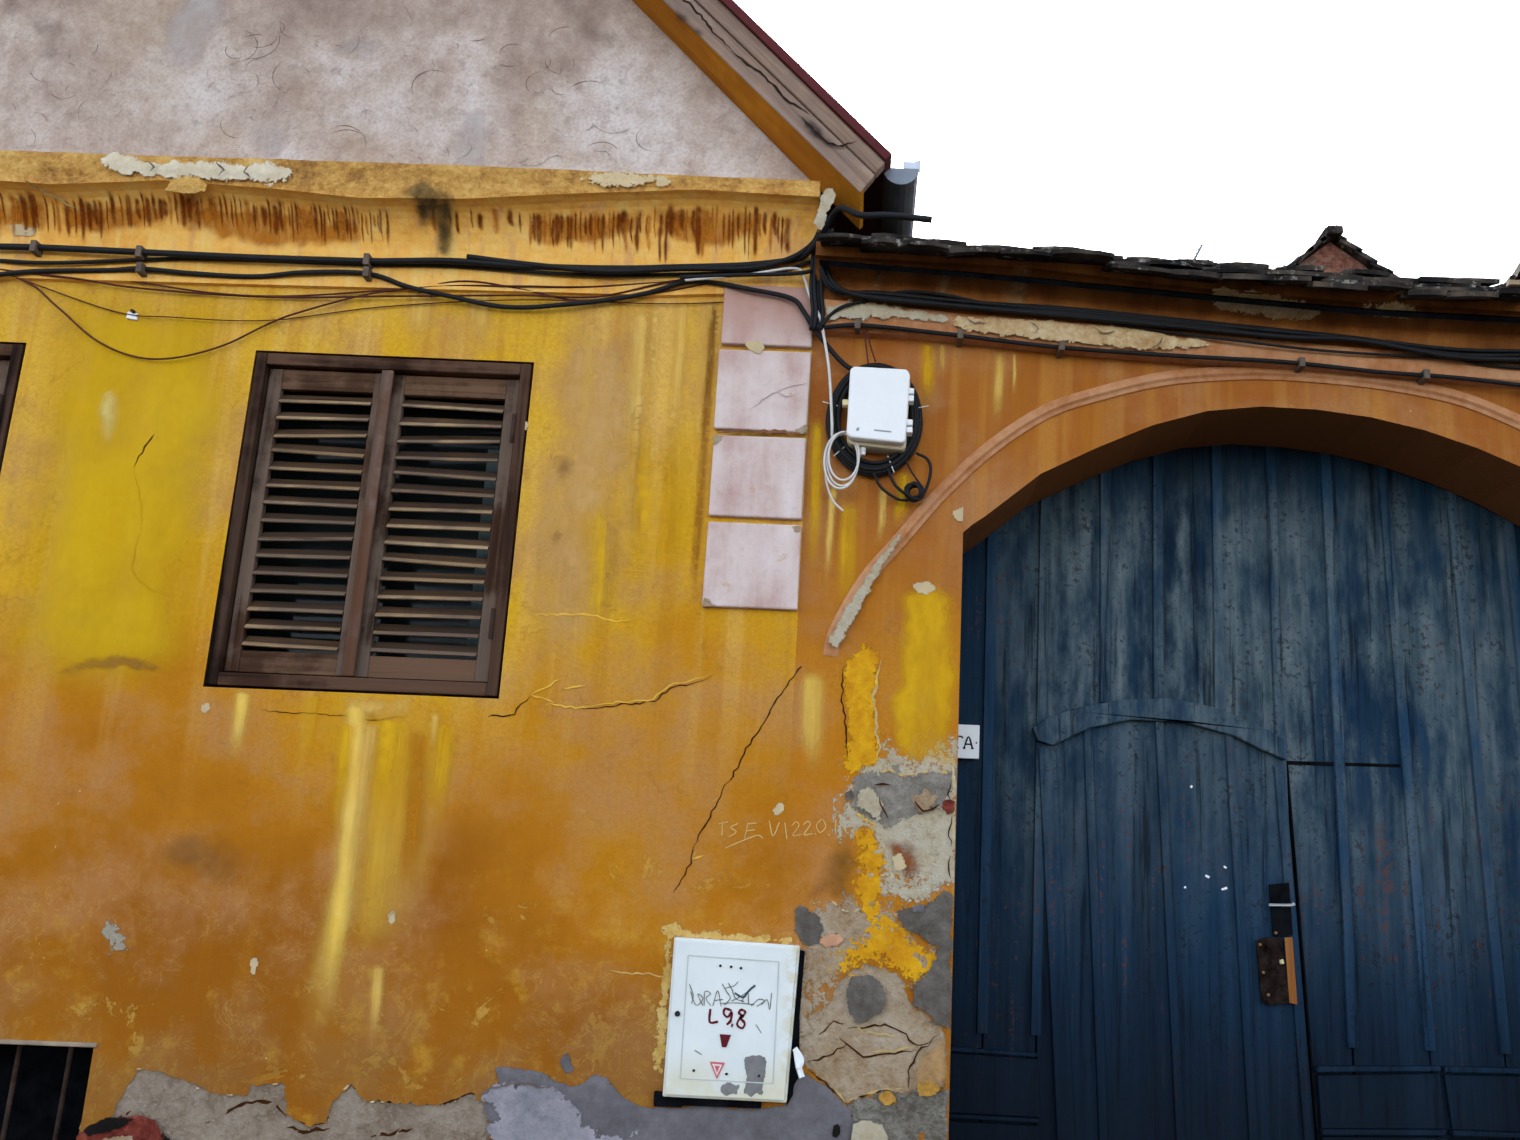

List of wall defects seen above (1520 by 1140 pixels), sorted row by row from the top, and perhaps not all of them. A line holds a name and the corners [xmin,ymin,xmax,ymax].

corrosion [0,192,389,241]
peeling [826,299,1209,350]
crack [130,435,171,597]
crack [488,673,712,717]
crack [673,666,802,893]
leakage [324,702,450,976]
flaking render [652,534,958,1140]
leakage [372,968,382,1017]
flaking render [76,1068,490,1140]